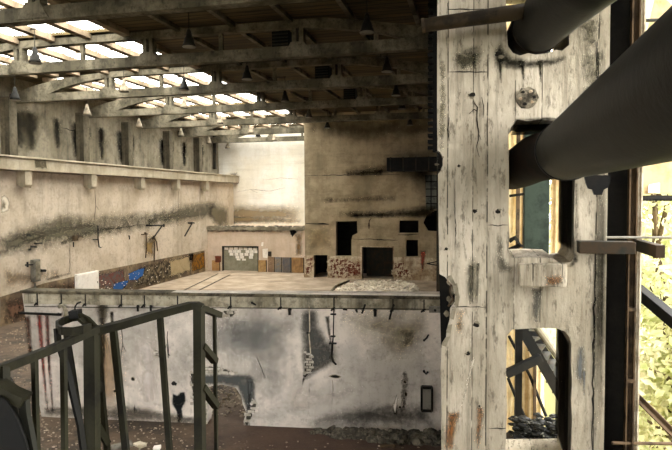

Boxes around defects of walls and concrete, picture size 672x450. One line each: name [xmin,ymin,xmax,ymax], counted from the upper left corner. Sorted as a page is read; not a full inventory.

damp [17,113,37,148]
crack [469,100,484,157]
damp [0,204,295,253]
spalling [439,274,460,347]
rust [446,414,457,448]